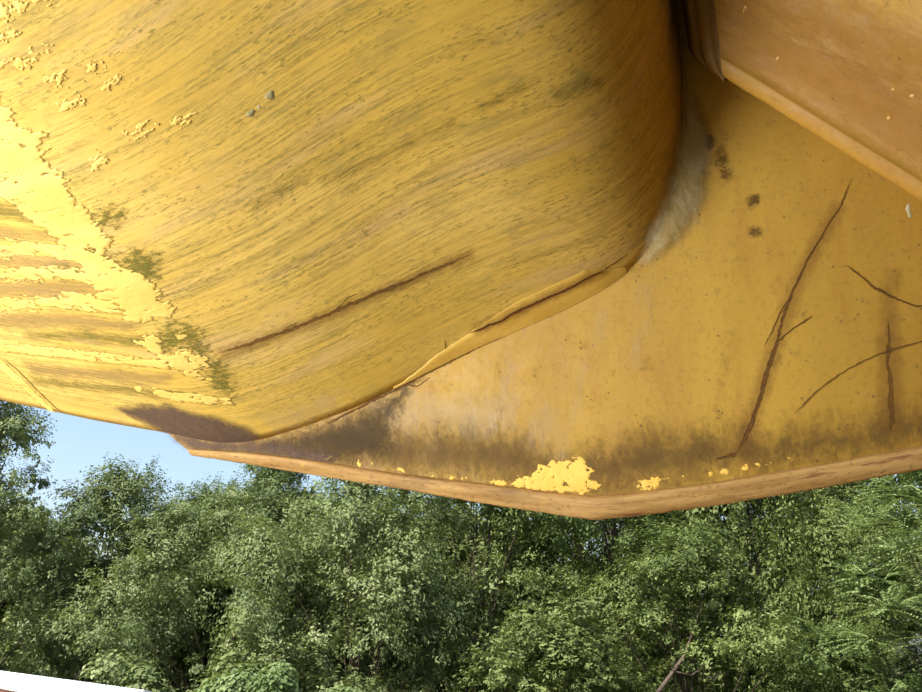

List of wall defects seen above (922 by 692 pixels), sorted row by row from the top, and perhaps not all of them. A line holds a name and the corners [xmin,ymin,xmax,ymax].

peeling [0,106,176,323]
damp [0,279,95,298]
damp [0,313,145,348]
peeling [0,333,213,412]
crack [228,255,468,351]
crack [330,255,626,422]
crack [717,185,849,460]
crack [847,266,922,307]
damp [27,362,550,479]
peeling [490,456,602,495]
peeling [636,476,669,491]
damp [585,438,726,484]